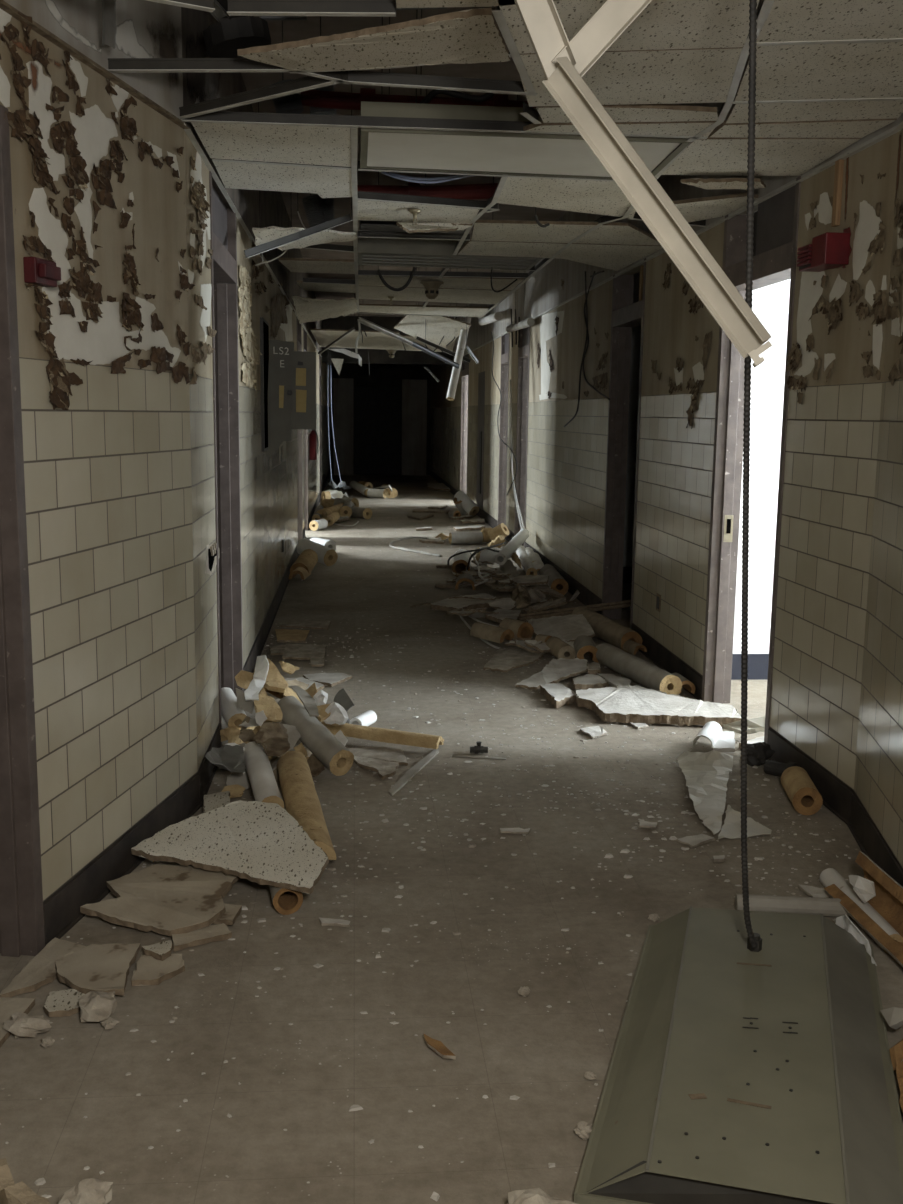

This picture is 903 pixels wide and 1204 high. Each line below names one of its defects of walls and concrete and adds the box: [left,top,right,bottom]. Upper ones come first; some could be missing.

flaking render [45,0,102,52]
peeling [0,9,217,410]
peeling [805,192,833,230]
peeling [662,263,703,316]
peeling [786,199,903,404]
peeling [651,331,712,429]